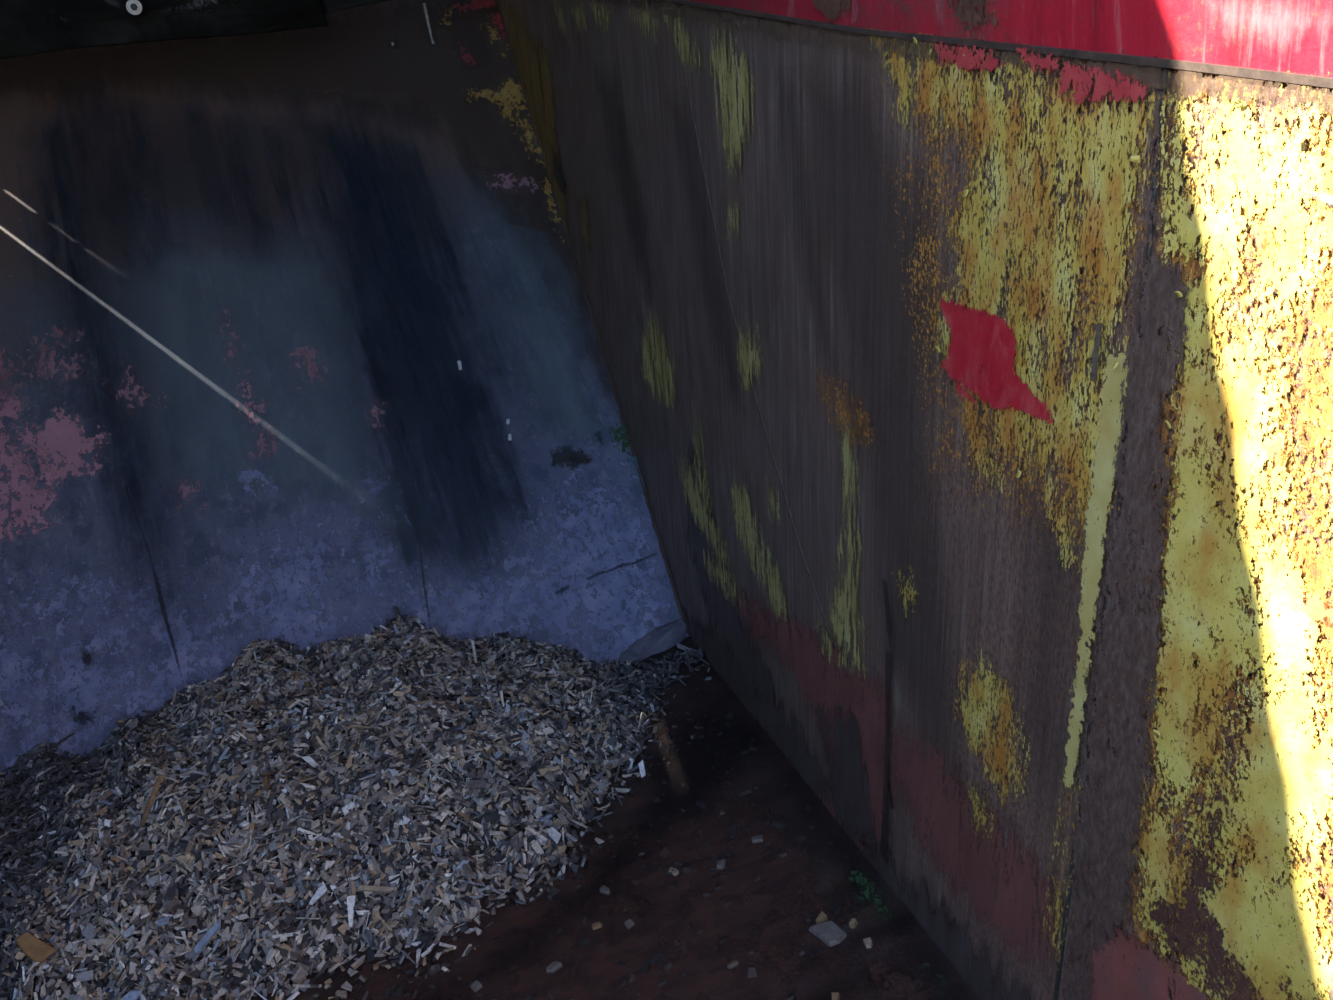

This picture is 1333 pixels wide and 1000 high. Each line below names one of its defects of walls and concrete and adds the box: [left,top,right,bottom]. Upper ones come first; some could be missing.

peeling [439,0,565,243]
water stain [48,127,500,559]
peeling [0,308,681,778]
rust [549,446,591,467]
peeling [870,28,1333,1000]
rust [883,60,1333,1000]
rust [333,772,857,1000]